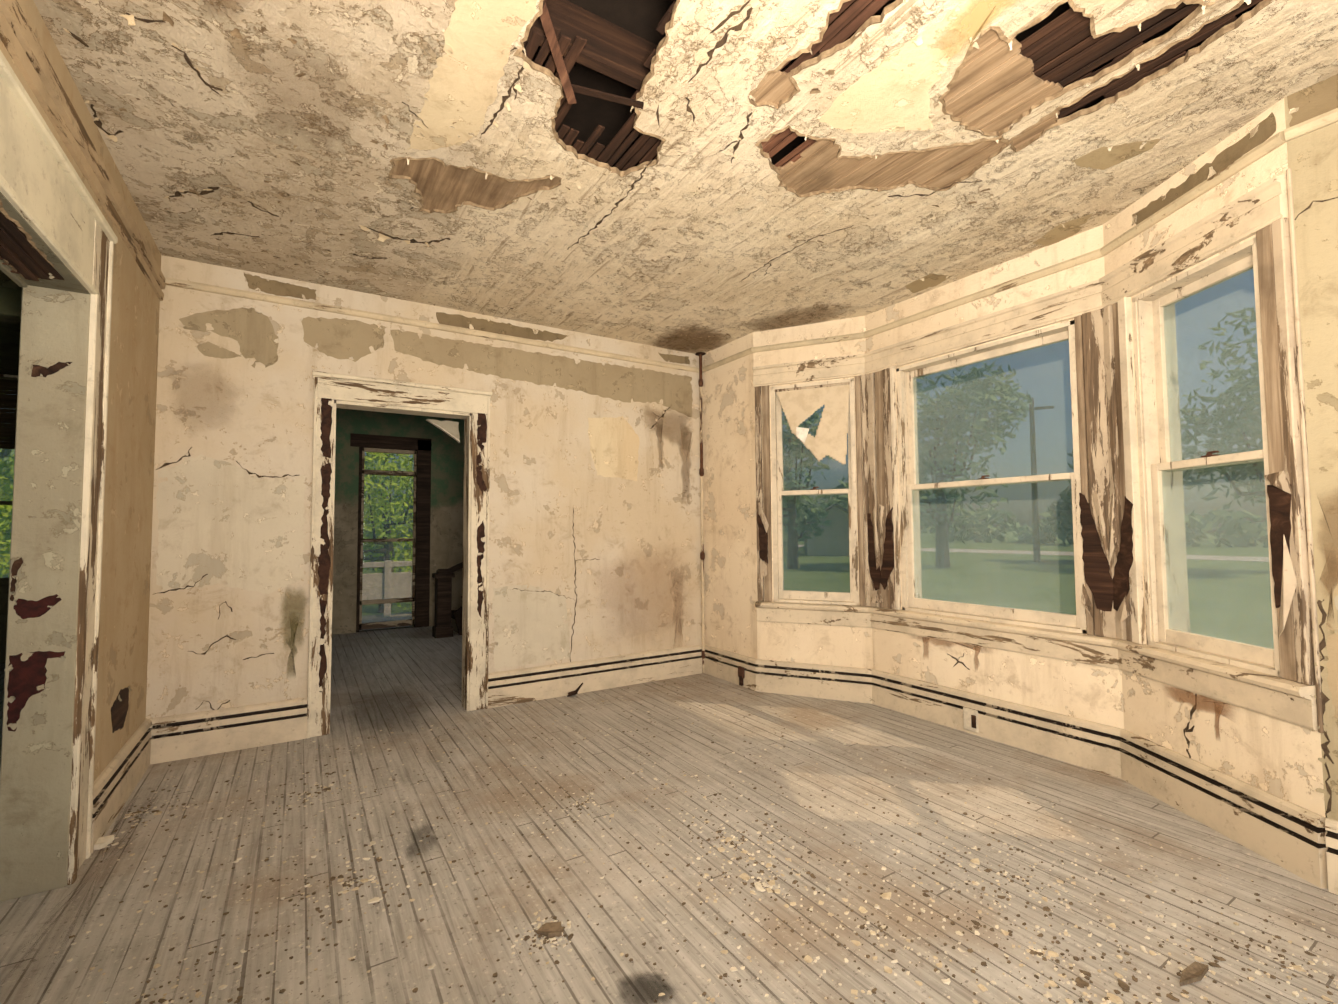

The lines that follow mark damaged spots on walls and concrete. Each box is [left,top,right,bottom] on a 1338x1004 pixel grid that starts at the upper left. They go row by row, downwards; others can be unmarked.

spalling [0,199,64,281]
peeling [162,156,345,300]
spalling [317,0,739,324]
crack [656,0,761,125]
crack [719,111,757,163]
spalling [743,0,1215,222]
crack [1295,197,1338,220]
peeling [174,307,279,371]
peeling [299,273,730,417]
peeling [10,557,62,619]
peeling [155,398,334,692]
peeling [4,651,66,732]